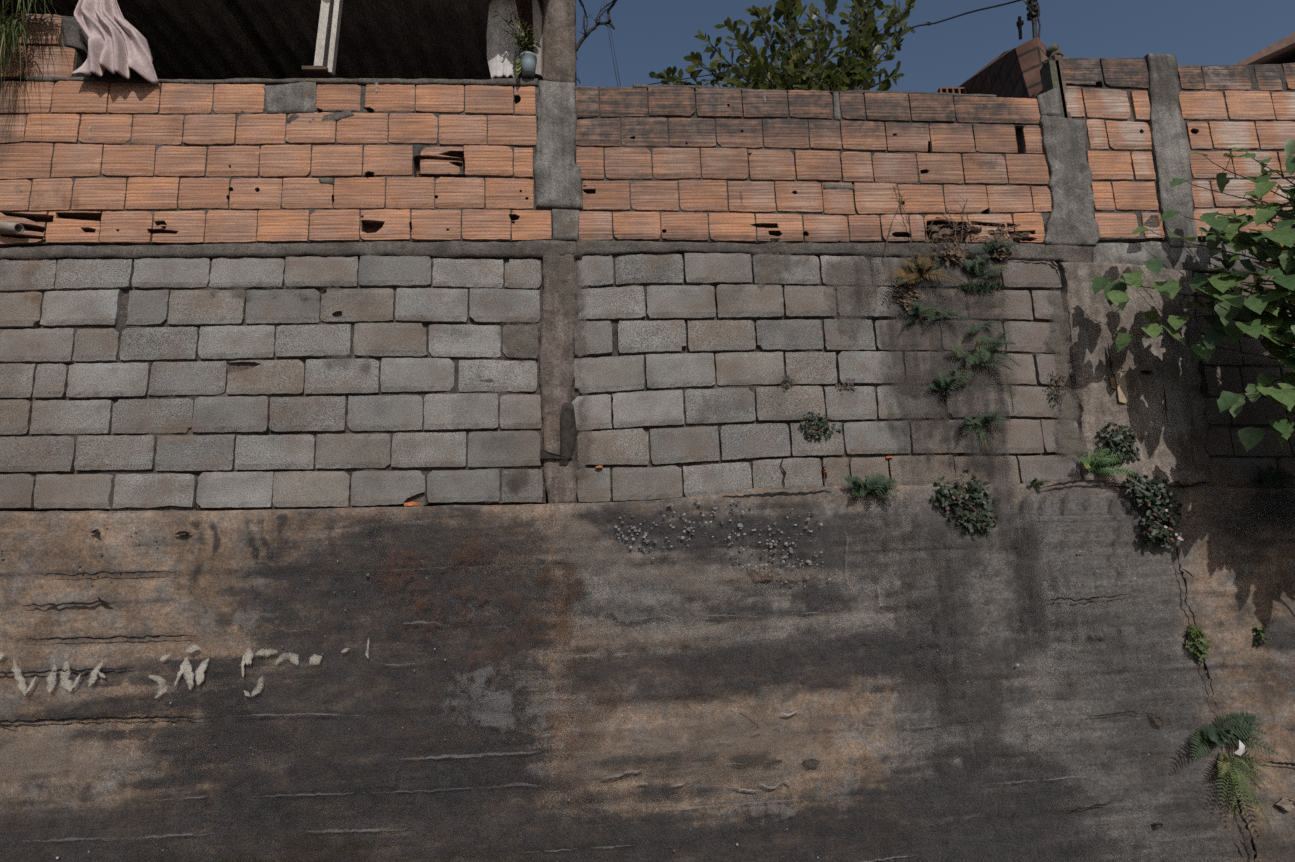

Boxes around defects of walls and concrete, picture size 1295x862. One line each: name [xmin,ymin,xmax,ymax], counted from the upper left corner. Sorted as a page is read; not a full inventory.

spalling [413,151,466,177]
spalling [872,224,969,244]
leakage [0,243,1144,862]
crack [1175,544,1219,709]
crack [1232,769,1257,862]